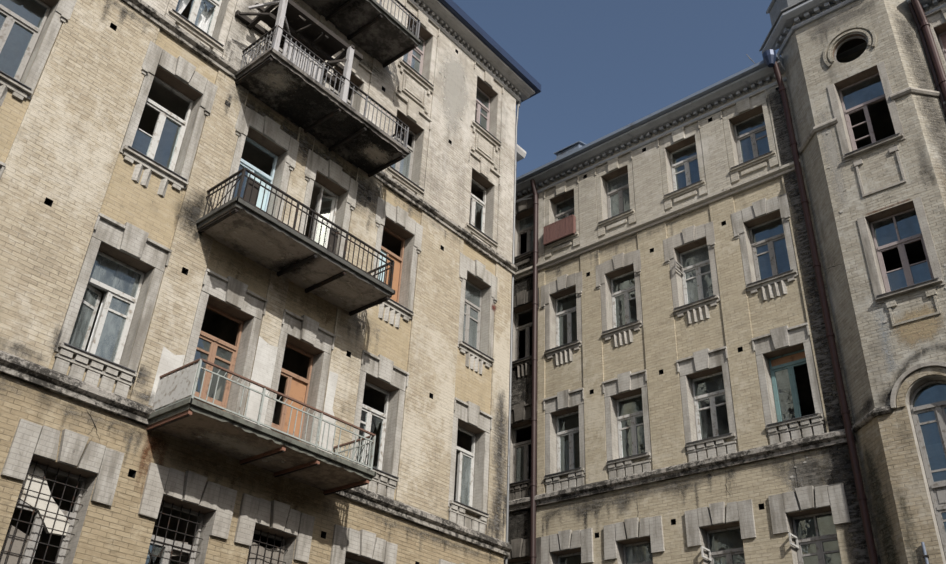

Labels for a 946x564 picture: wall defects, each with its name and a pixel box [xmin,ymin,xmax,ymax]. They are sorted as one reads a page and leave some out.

damp [466,395,509,542]
damp [772,452,842,499]